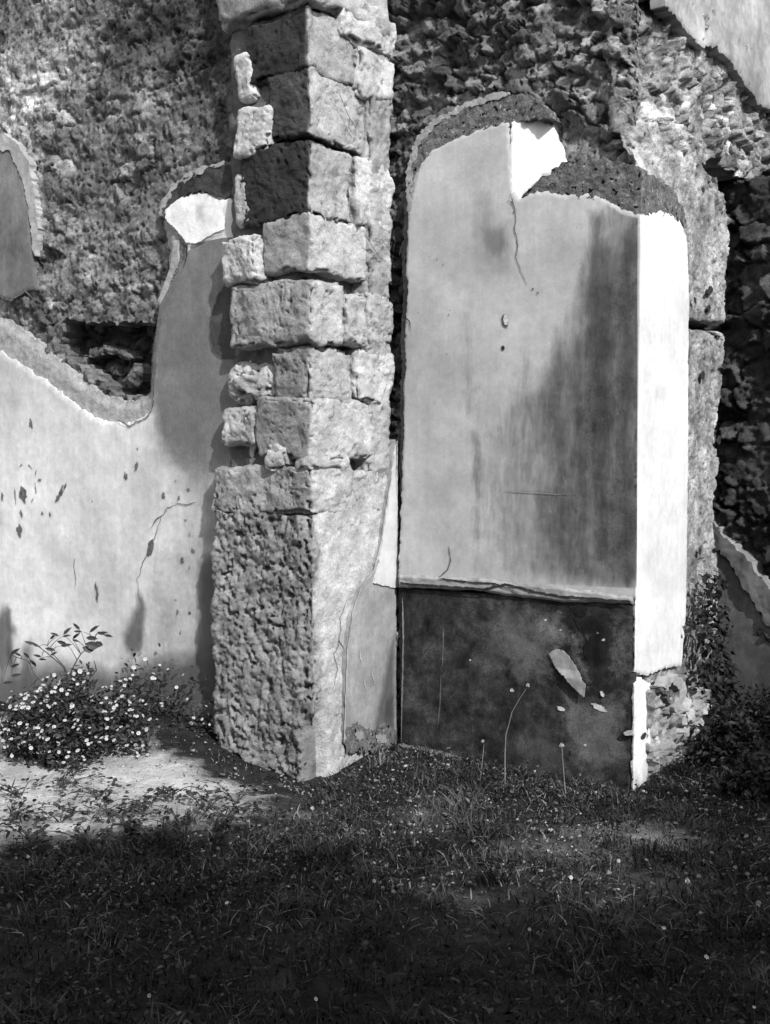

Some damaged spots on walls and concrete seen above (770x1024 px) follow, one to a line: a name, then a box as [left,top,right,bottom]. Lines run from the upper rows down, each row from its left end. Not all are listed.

flaking render [525,157,687,229]
peeling [158,161,233,305]
crack [508,197,539,293]
flaking render [209,284,235,360]
peeling [80,332,157,403]
water stain [537,217,638,585]
peeling [1,465,41,538]
crack [136,502,195,602]
crack [400,549,631,603]
flaking render [344,474,398,756]
peeling [654,673,687,713]